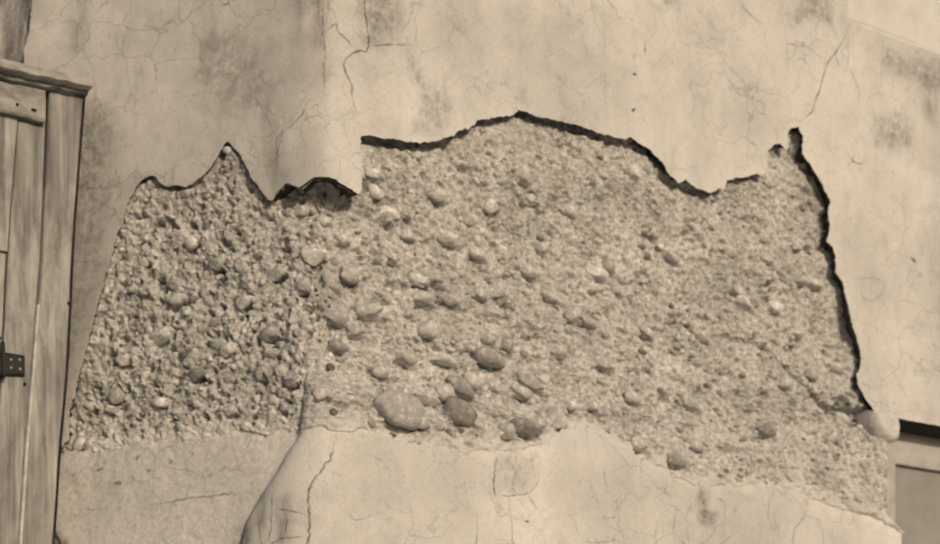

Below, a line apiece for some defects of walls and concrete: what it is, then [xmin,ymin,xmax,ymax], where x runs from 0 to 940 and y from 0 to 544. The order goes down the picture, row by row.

flaking render [0,0,33,63]
spalling [61,110,904,534]